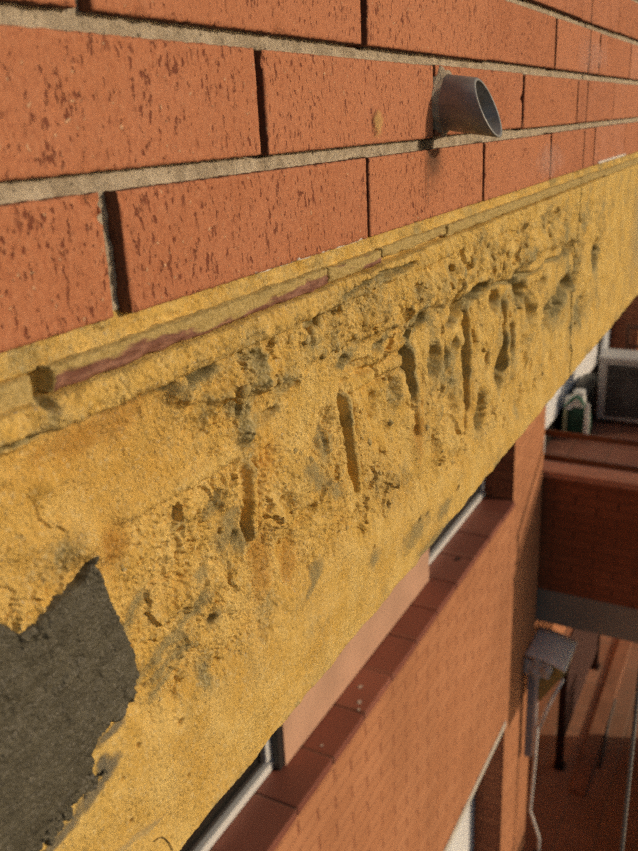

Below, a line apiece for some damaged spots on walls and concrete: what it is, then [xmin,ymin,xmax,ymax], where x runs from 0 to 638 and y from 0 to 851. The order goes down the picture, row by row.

spalling [109,196,604,719]